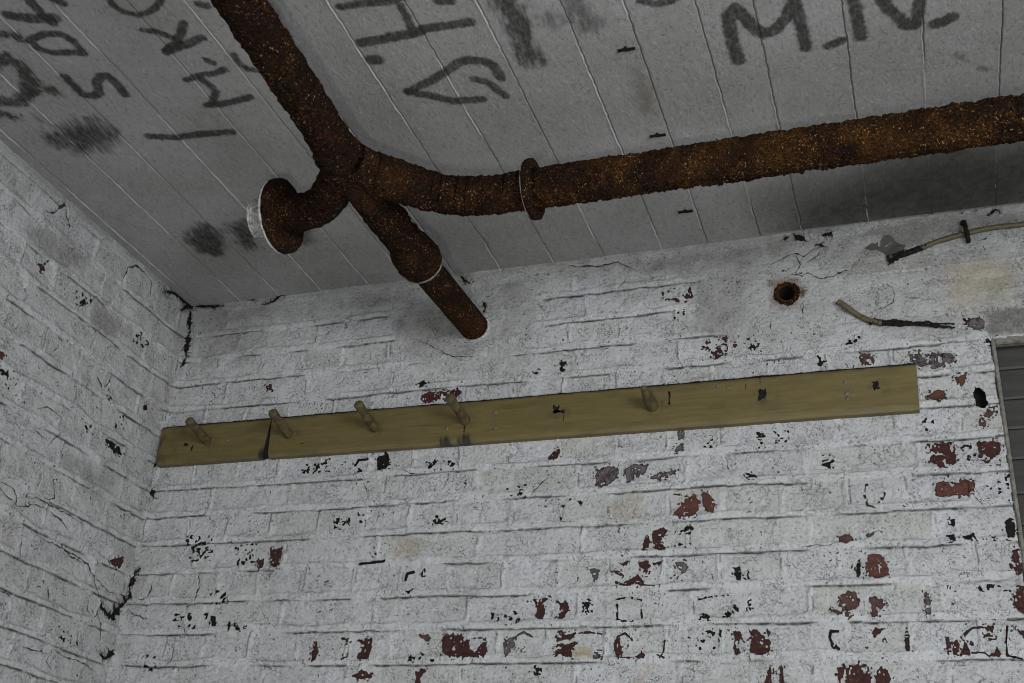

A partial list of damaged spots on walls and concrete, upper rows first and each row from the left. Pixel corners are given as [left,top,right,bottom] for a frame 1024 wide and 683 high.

crack [768,246,855,279]
rust [773,282,805,306]
peeling [593,462,679,489]
peeling [922,405,1010,501]
crack [0,476,153,638]
peeling [234,543,283,571]
peeling [577,489,717,662]
peeling [854,553,890,579]
peeling [408,632,488,683]
peeling [687,594,787,683]
peeling [829,590,894,683]